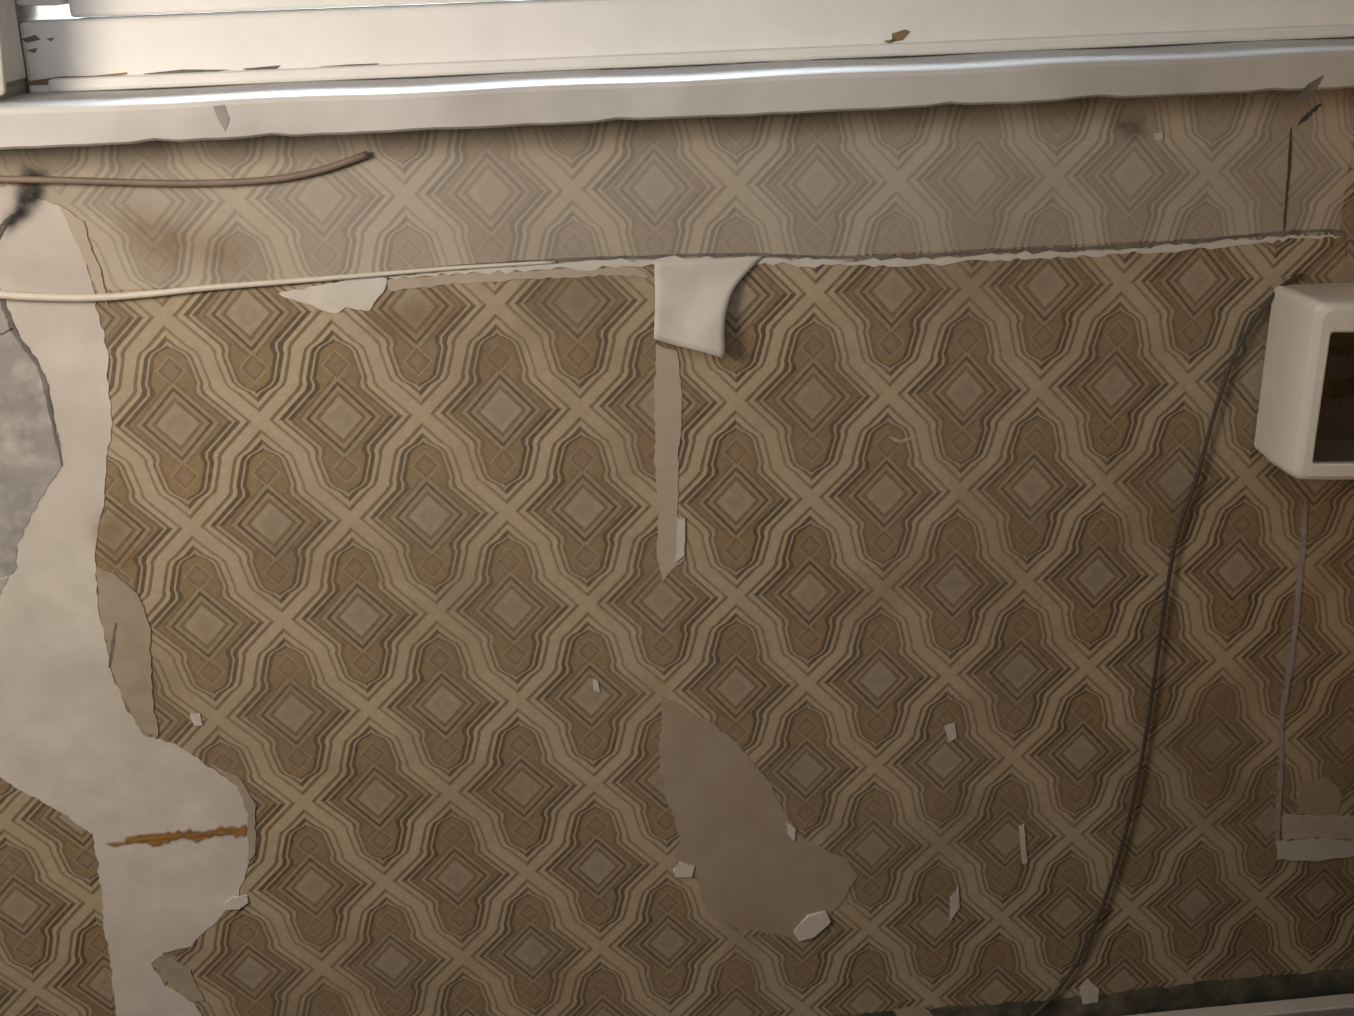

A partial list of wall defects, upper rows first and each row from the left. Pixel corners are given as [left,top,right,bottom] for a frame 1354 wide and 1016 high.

spalling [0,289,61,594]
peeling [675,518,685,562]
spalling [190,713,203,726]
rust [107,825,246,847]
peeling [786,821,796,841]
peeling [672,862,695,878]
peeling [224,895,249,910]
peeling [794,910,831,941]